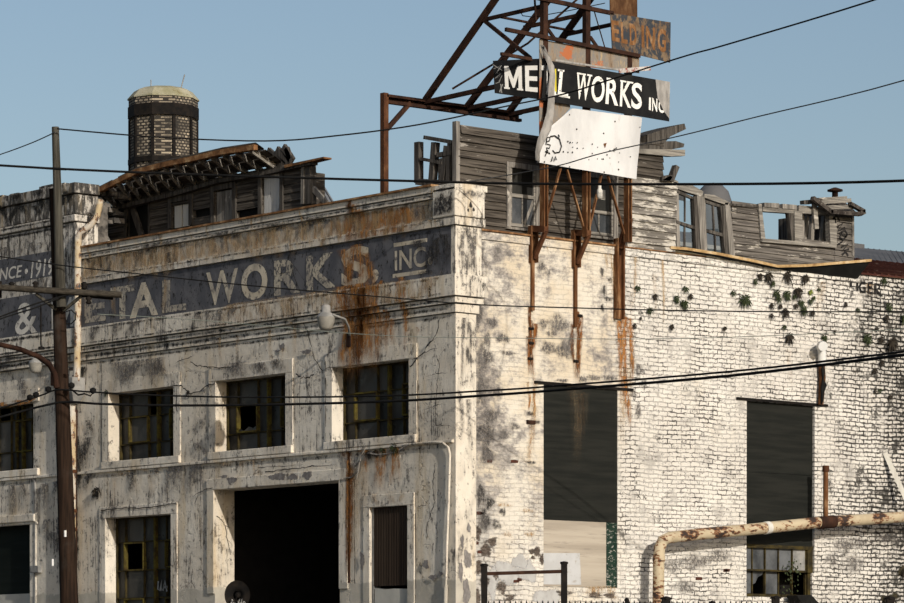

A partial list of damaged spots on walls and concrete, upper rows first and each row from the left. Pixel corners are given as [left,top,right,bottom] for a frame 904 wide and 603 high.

corrosion [285,186,436,365]
corrosion [526,307,538,370]
corrosion [571,312,583,373]
corrosion [617,317,634,416]
peeling [268,471,312,480]
peeling [458,511,522,603]
peeling [528,547,544,565]